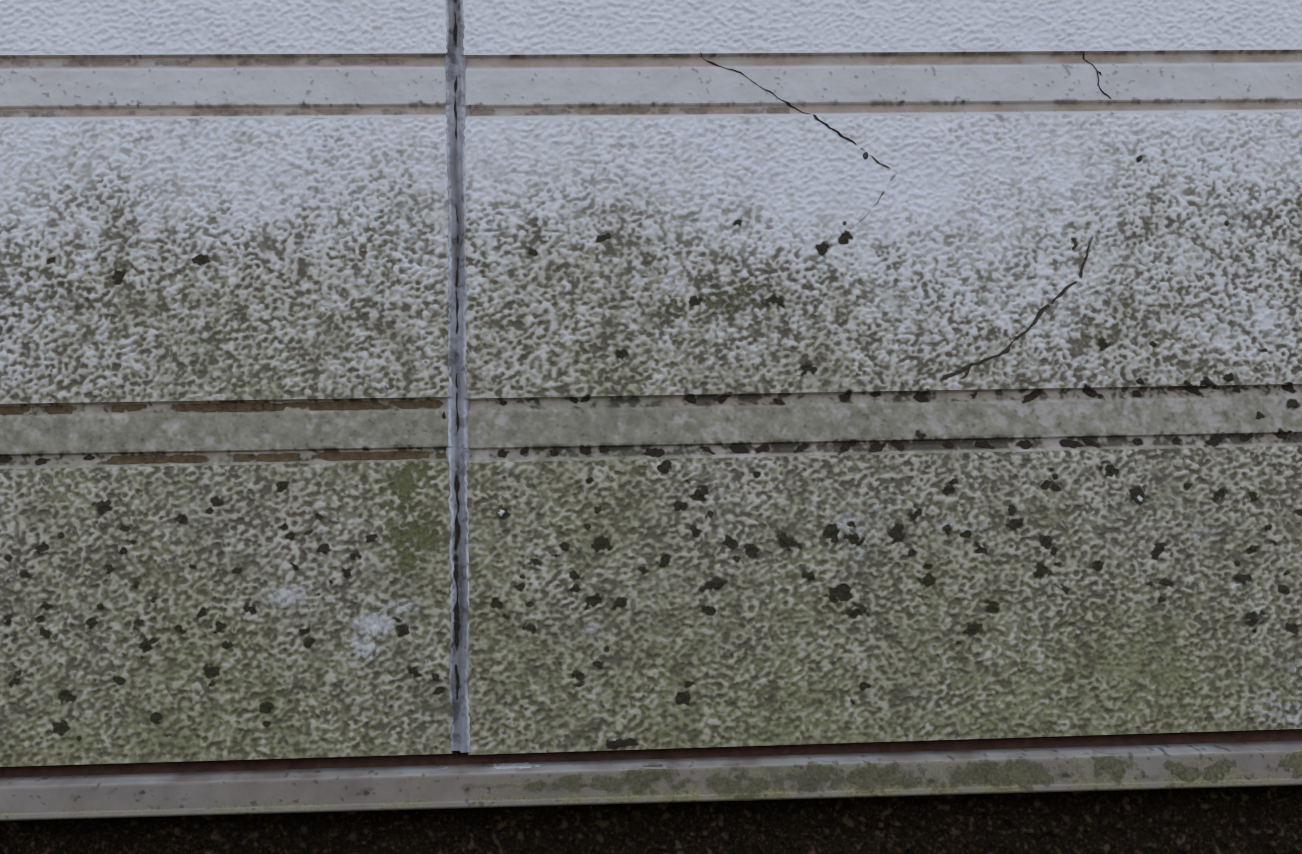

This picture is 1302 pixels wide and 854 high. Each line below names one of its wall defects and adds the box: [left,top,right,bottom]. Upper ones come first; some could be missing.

crack [1083,52,1111,99]
crack [700,52,893,225]
damp [667,300,684,316]
damp [698,261,767,314]
crack [942,237,1093,380]
damp [380,460,440,578]
damp [835,513,867,564]
efflorescence [266,586,312,606]
efflorescence [351,600,420,661]
efflorescence [1256,690,1302,725]